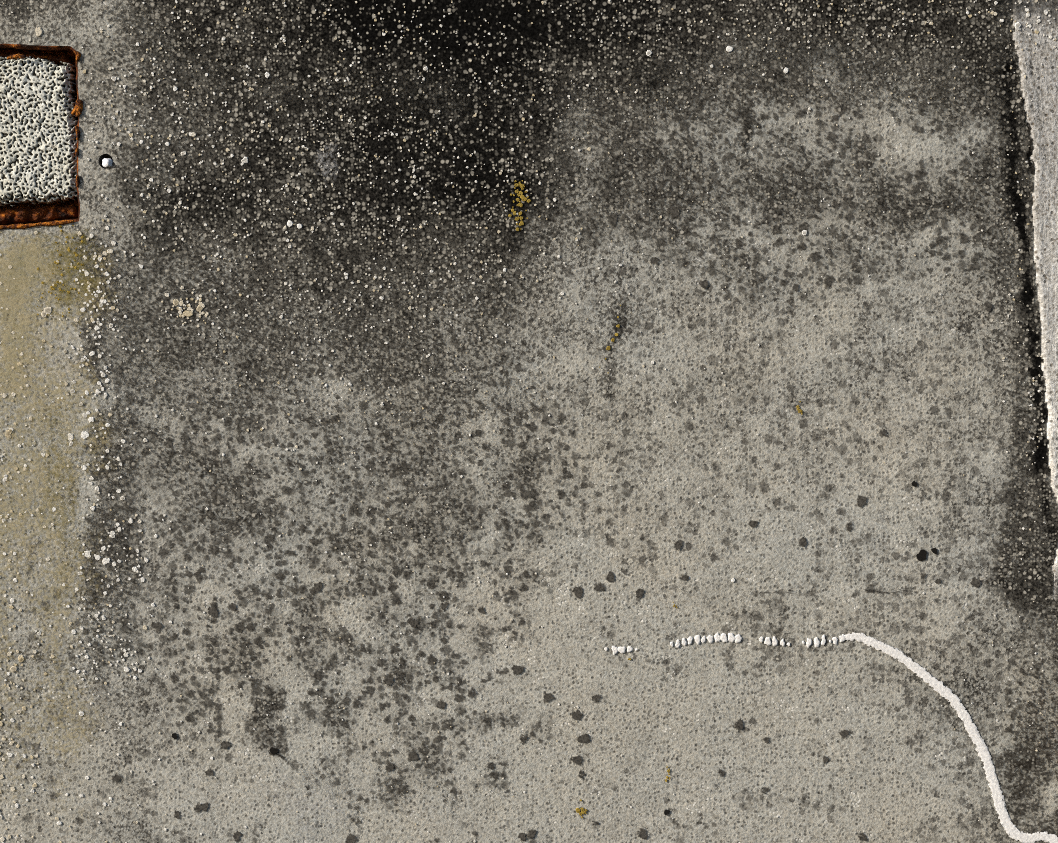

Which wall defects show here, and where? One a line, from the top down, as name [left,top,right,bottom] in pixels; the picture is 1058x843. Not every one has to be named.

water stain [0,0,1005,699]
water stain [987,59,1058,837]
crack [1025,105,1035,174]
water stain [1004,0,1058,14]